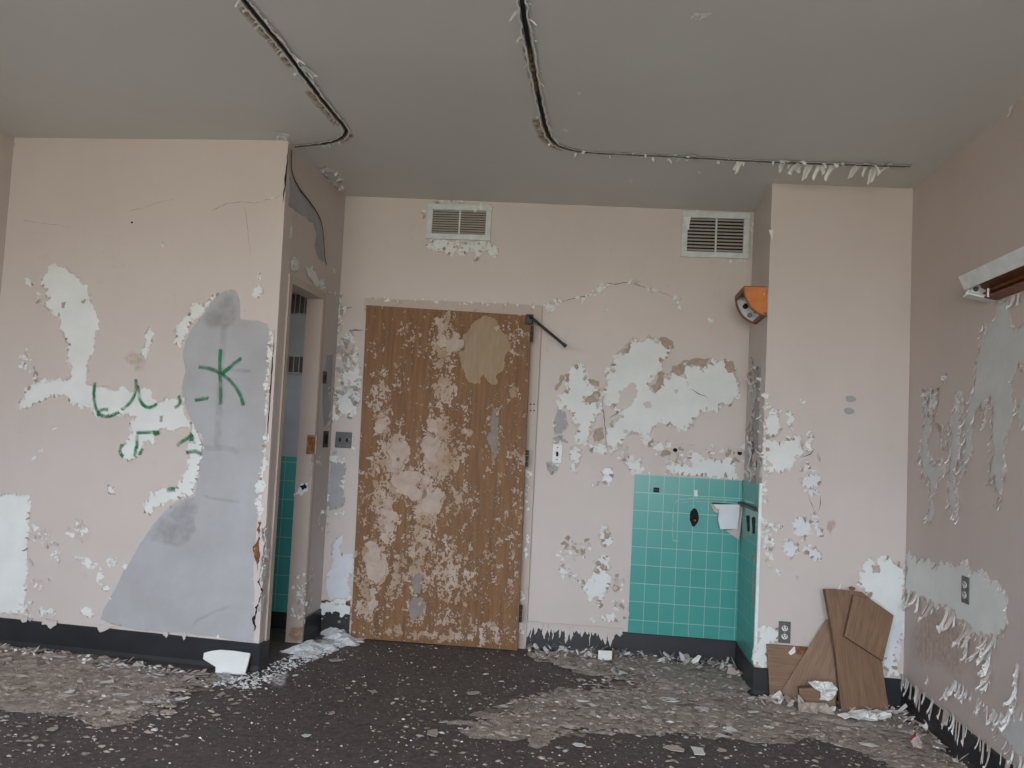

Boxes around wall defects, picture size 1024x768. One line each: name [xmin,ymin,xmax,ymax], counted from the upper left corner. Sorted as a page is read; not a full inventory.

peeling [0,263,275,643]